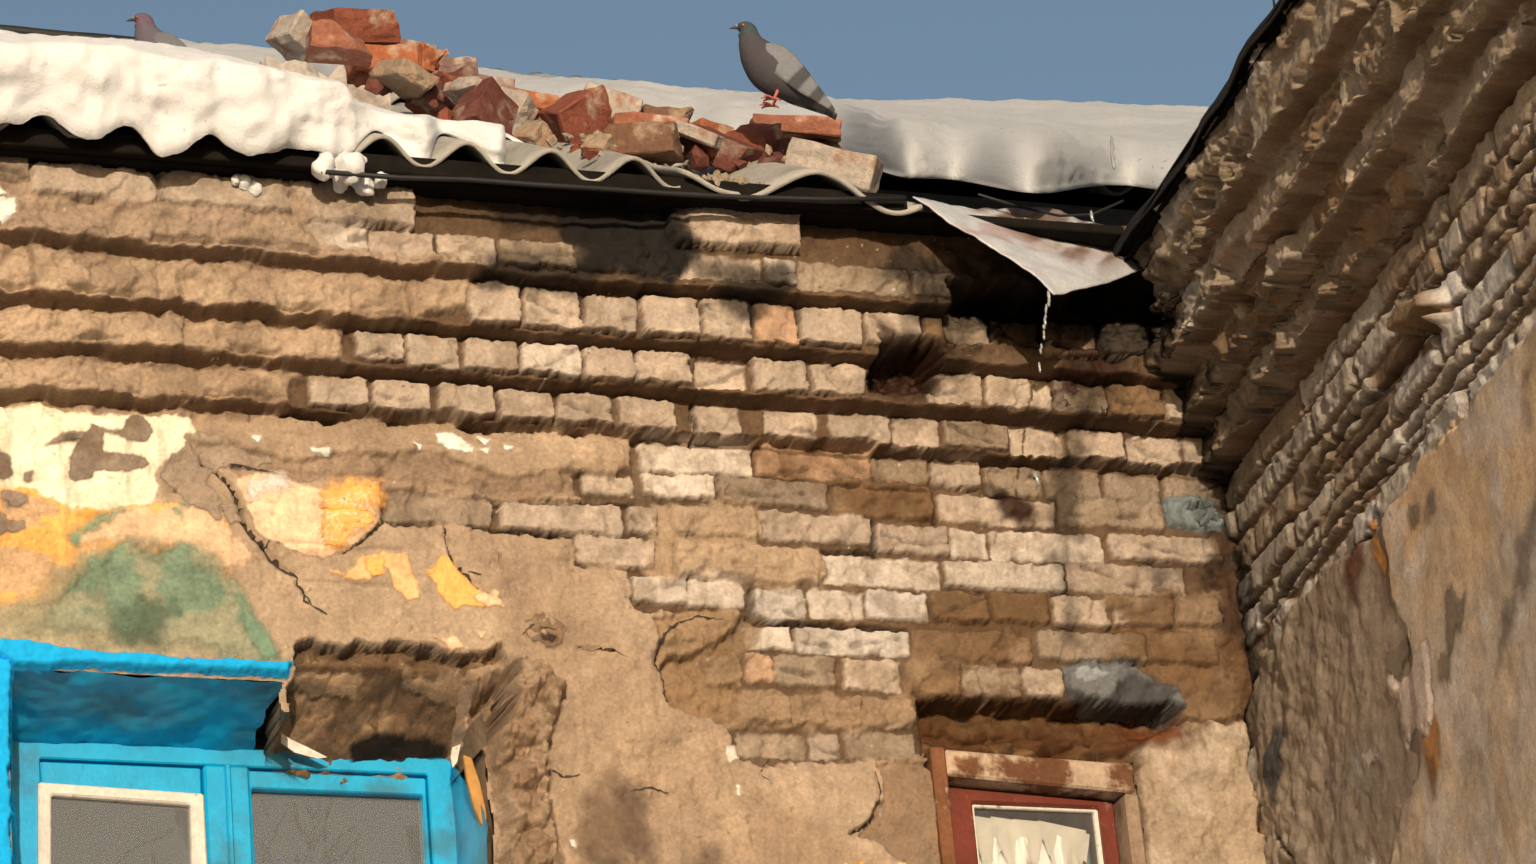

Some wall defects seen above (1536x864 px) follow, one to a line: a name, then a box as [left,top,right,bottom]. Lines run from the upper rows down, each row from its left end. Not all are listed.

damp [479,206,699,300]
damp [711,265,790,321]
peeling [0,452,34,534]
crack [200,463,327,615]
peeling [46,415,512,609]
peeling [1162,496,1225,534]
peeling [1408,490,1435,527]
spalling [264,631,492,784]
peeling [1062,658,1187,731]
peeling [1385,586,1466,750]
peeling [725,745,739,763]